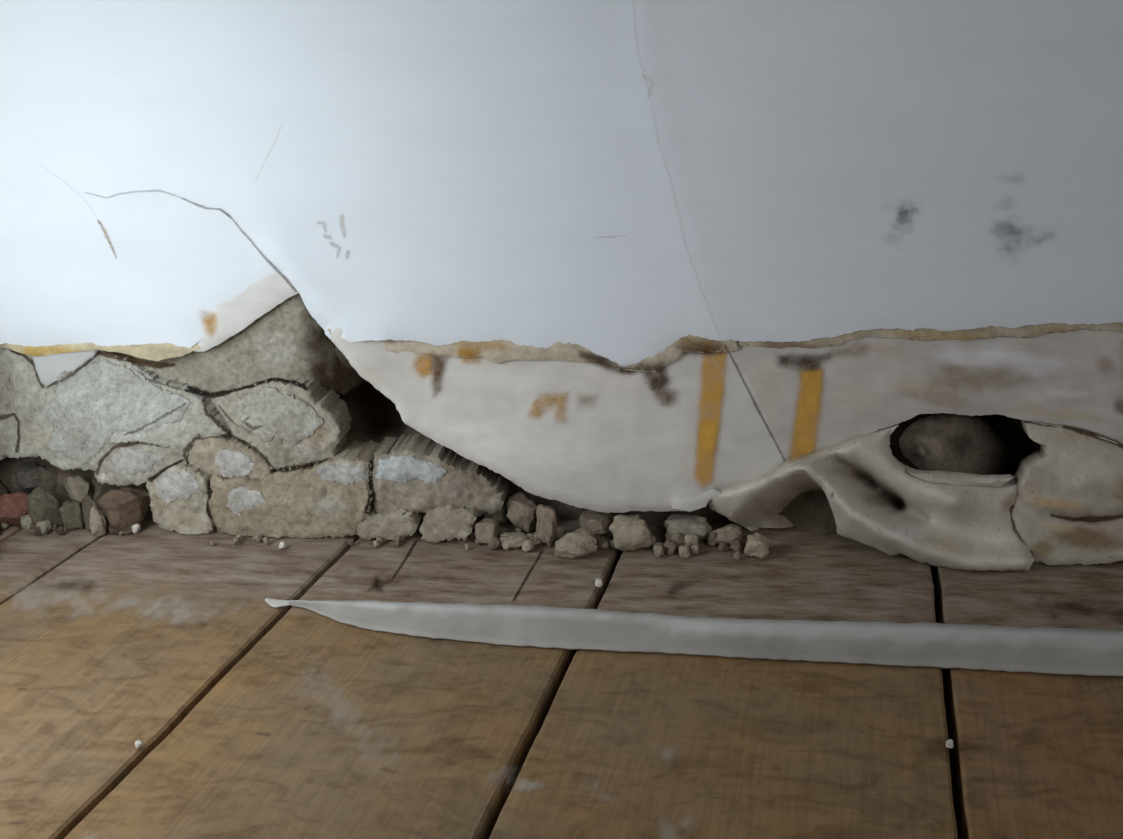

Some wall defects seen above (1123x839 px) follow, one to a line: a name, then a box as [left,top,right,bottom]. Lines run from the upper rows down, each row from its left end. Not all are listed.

crack [98,221,116,258]
corrosion [416,356,444,383]
peeling [383,322,1123,372]
corrosion [780,357,826,371]
flaking render [0,272,510,543]
crack [725,346,784,460]
spalling [889,413,941,470]
flaking render [975,414,1123,565]